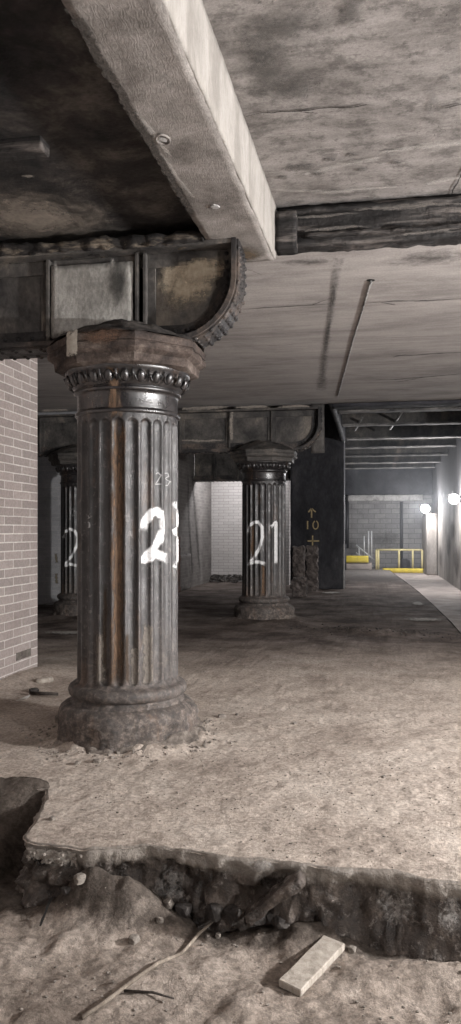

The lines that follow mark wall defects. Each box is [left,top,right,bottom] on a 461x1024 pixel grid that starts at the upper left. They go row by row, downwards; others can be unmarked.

corrosion [102,367,129,682]
spalling [15,788,461,962]